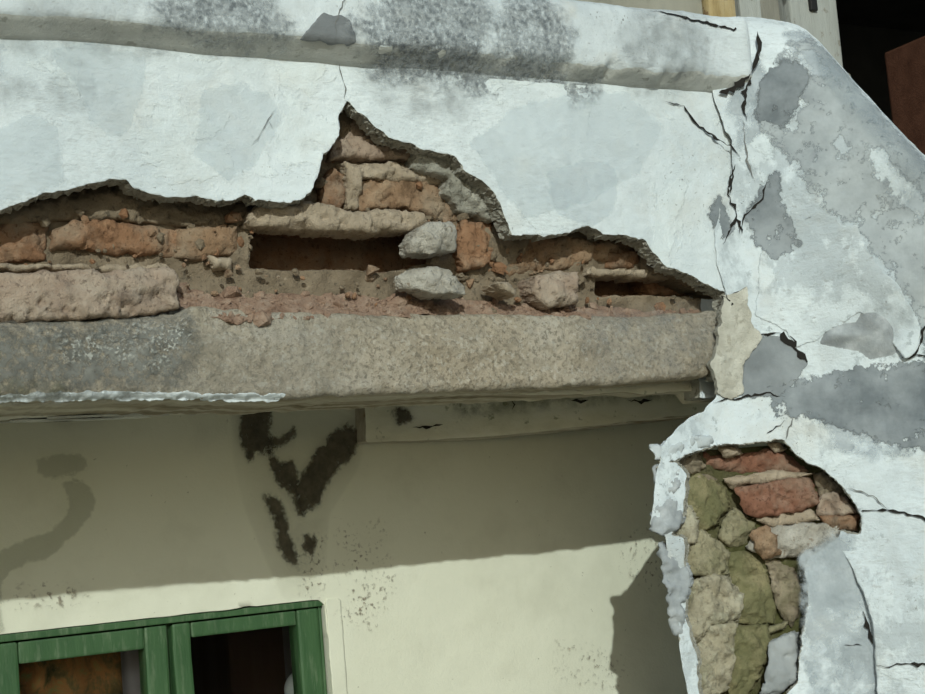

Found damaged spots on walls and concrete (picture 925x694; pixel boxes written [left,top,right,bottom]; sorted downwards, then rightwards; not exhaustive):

peeling [300,13,356,46]
crack [660,11,768,244]
spalling [0,32,925,454]
crack [902,326,925,359]
water stain [269,426,306,516]
crack [853,489,925,521]
spalling [675,442,925,694]